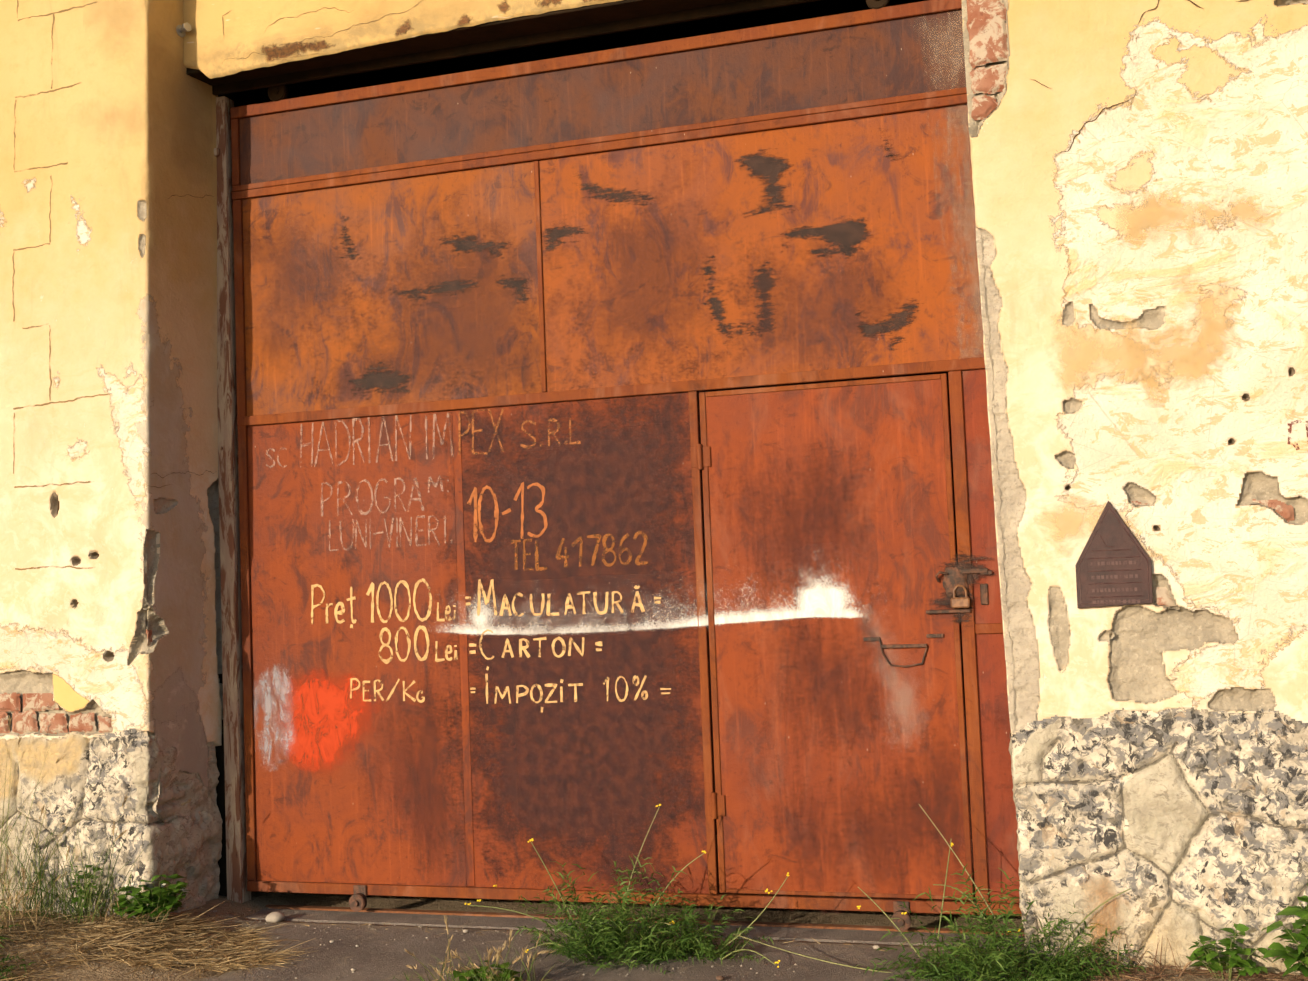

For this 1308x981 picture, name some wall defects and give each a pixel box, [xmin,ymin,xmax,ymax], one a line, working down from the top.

corrosion [262,40,332,61]
spalling [962,0,1010,138]
corrosion [578,175,653,206]
corrosion [735,149,793,215]
corrosion [783,219,871,257]
corrosion [702,256,777,335]
corrosion [855,303,919,350]
peeling [1049,0,1308,714]
flaking render [0,293,223,736]
spalling [975,225,1071,734]
corrosion [445,394,710,891]
spalling [153,773,197,822]